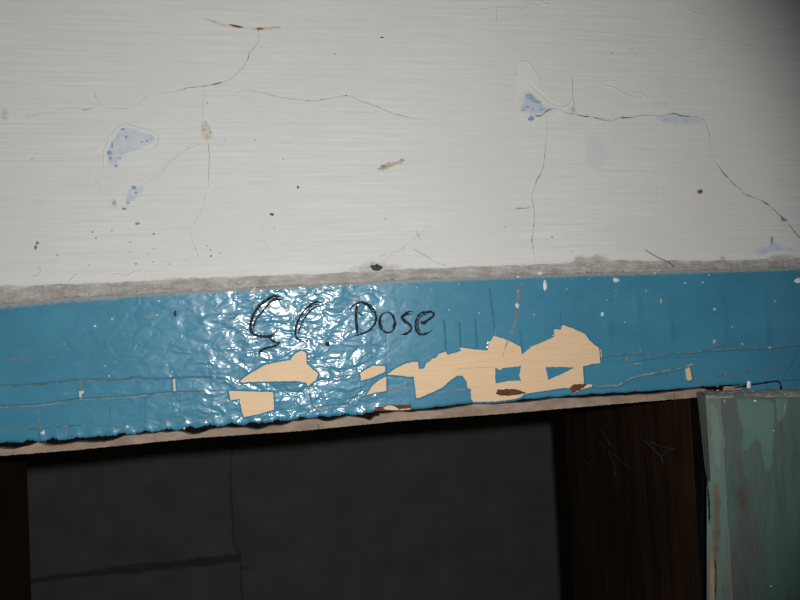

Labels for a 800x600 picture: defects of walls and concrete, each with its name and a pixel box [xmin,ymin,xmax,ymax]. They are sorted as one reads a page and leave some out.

corrosion [217,22,283,32]
crack [535,80,800,238]
peeling [227,349,320,419]
peeling [359,323,602,411]